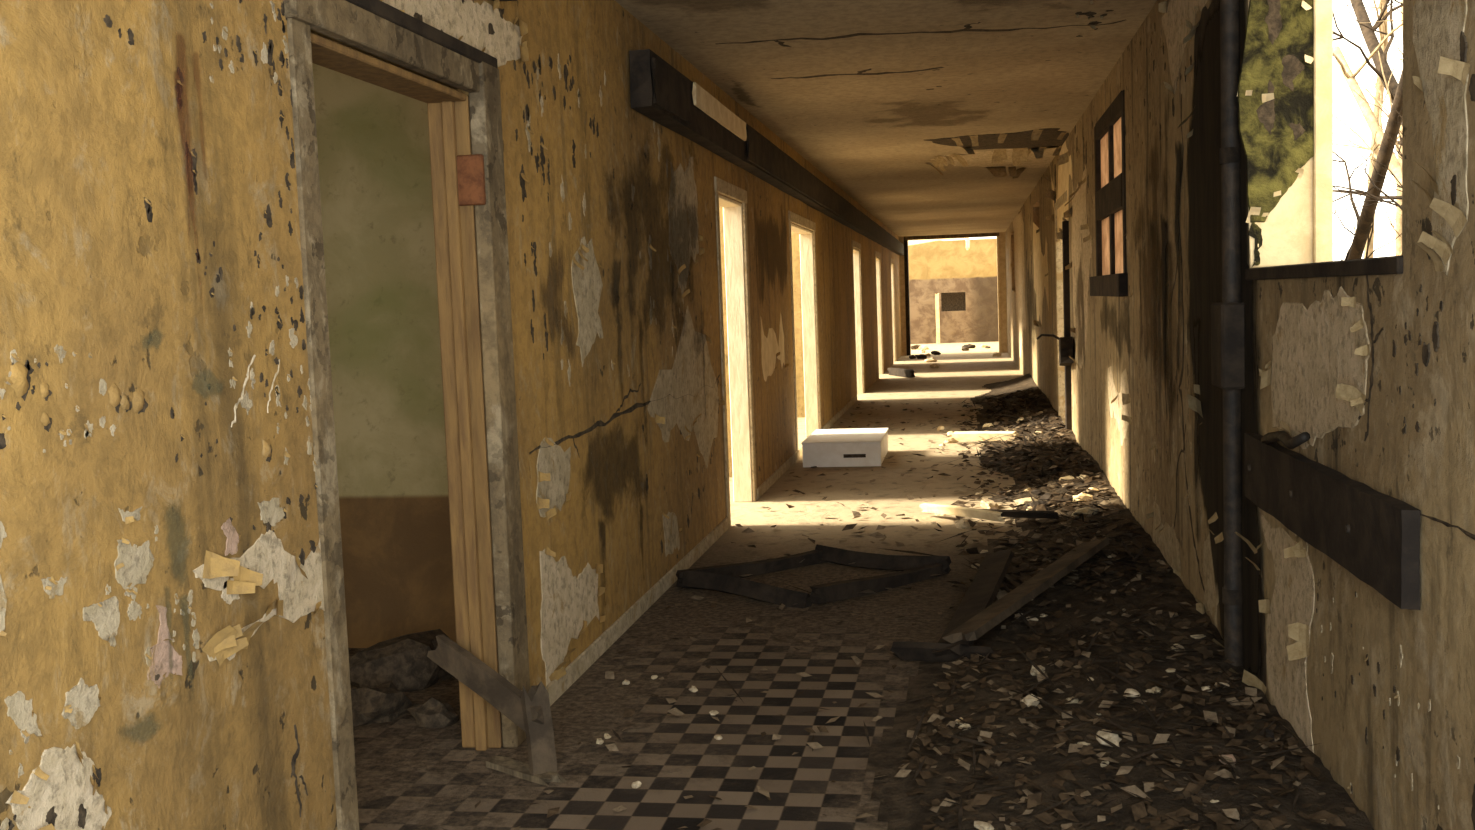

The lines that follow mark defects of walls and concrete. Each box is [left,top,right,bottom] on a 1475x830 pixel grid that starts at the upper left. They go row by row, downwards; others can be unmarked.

crack [716,20,1126,79]
peeling [83,0,325,688]
peeling [380,0,606,386]
leakage [543,253,572,352]
crack [529,374,720,458]
peeling [924,122,1093,378]
peeling [1259,286,1371,449]
crack [1421,514,1475,540]
peeling [540,545,606,686]
peeling [1195,512,1431,753]
peeling [0,677,112,830]